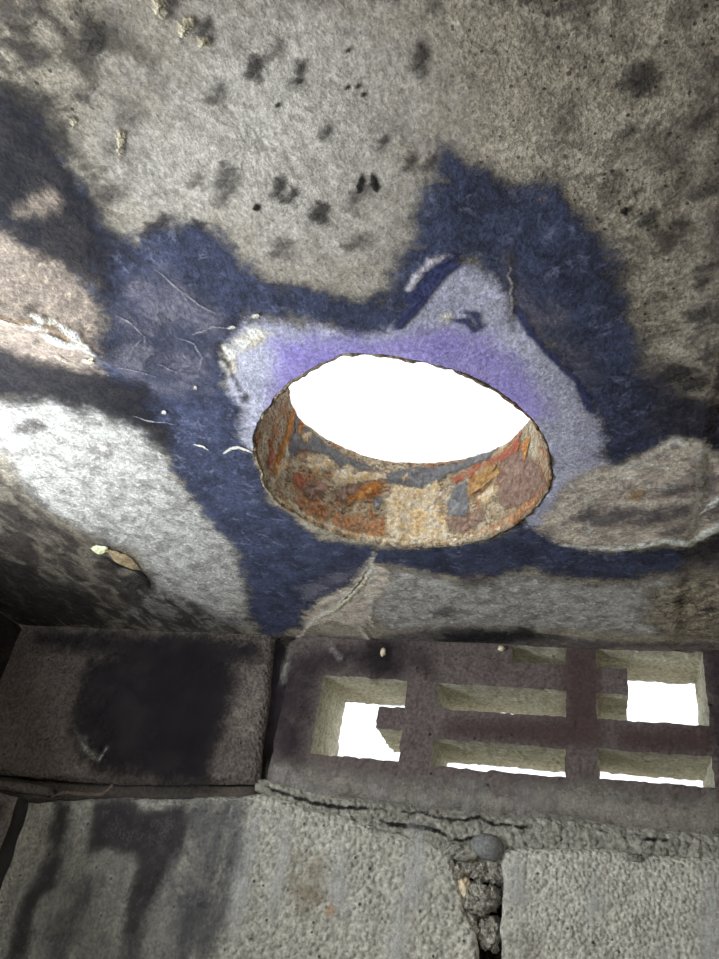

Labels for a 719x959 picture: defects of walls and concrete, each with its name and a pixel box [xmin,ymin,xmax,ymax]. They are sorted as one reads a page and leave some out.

leakage [0,0,122,104]
leakage [98,0,437,272]
rust [267,408,305,475]
rust [291,471,390,537]
leakage [216,263,719,572]
rust [445,430,547,535]
leakage [0,396,248,787]
leakage [371,572,677,635]
leakage [11,802,68,959]
leakage [90,800,249,959]
crack [268,786,528,842]
crack [643,837,667,857]